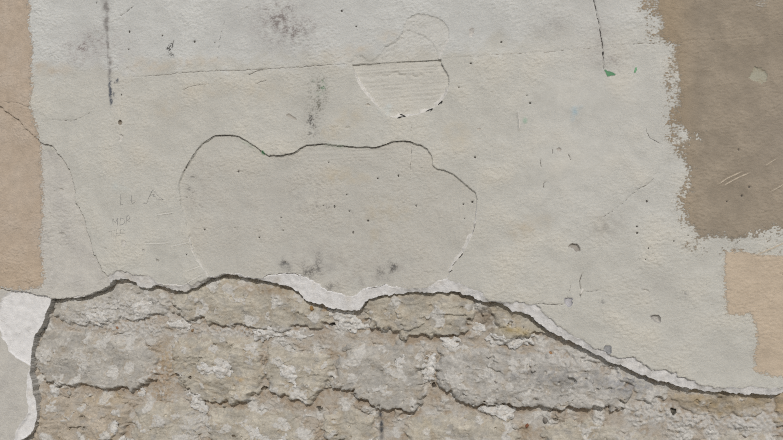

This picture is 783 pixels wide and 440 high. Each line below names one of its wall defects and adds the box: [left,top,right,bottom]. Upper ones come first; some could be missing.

peeling [0,135,783,440]